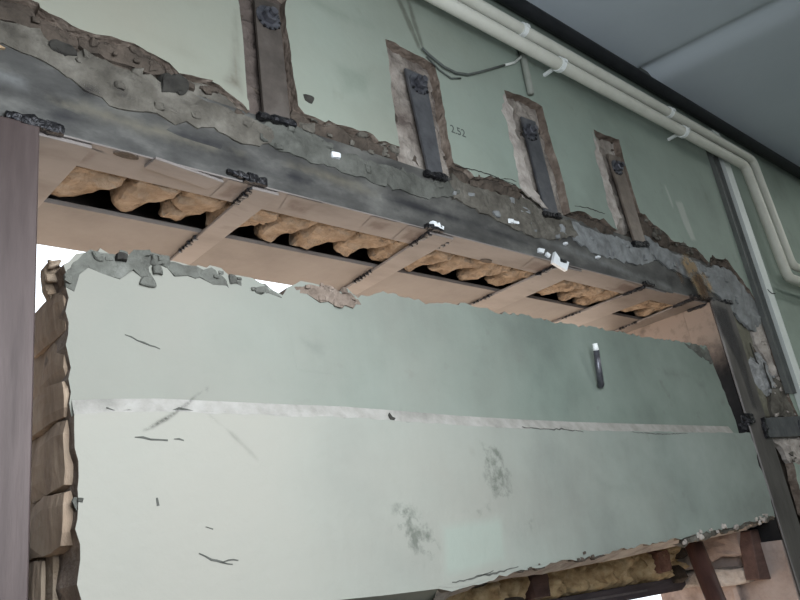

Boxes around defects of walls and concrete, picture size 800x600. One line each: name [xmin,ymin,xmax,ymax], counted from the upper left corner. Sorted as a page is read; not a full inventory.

flaking render [48,37,244,115]
flaking render [287,110,400,161]
flaking render [443,93,548,214]
spalling [51,166,233,227]
flaking render [556,132,622,239]
spalling [239,209,409,262]
spalling [404,250,536,286]
flaking render [638,216,734,274]
flaking render [684,343,714,364]
damp [465,436,519,519]
damp [369,491,441,567]